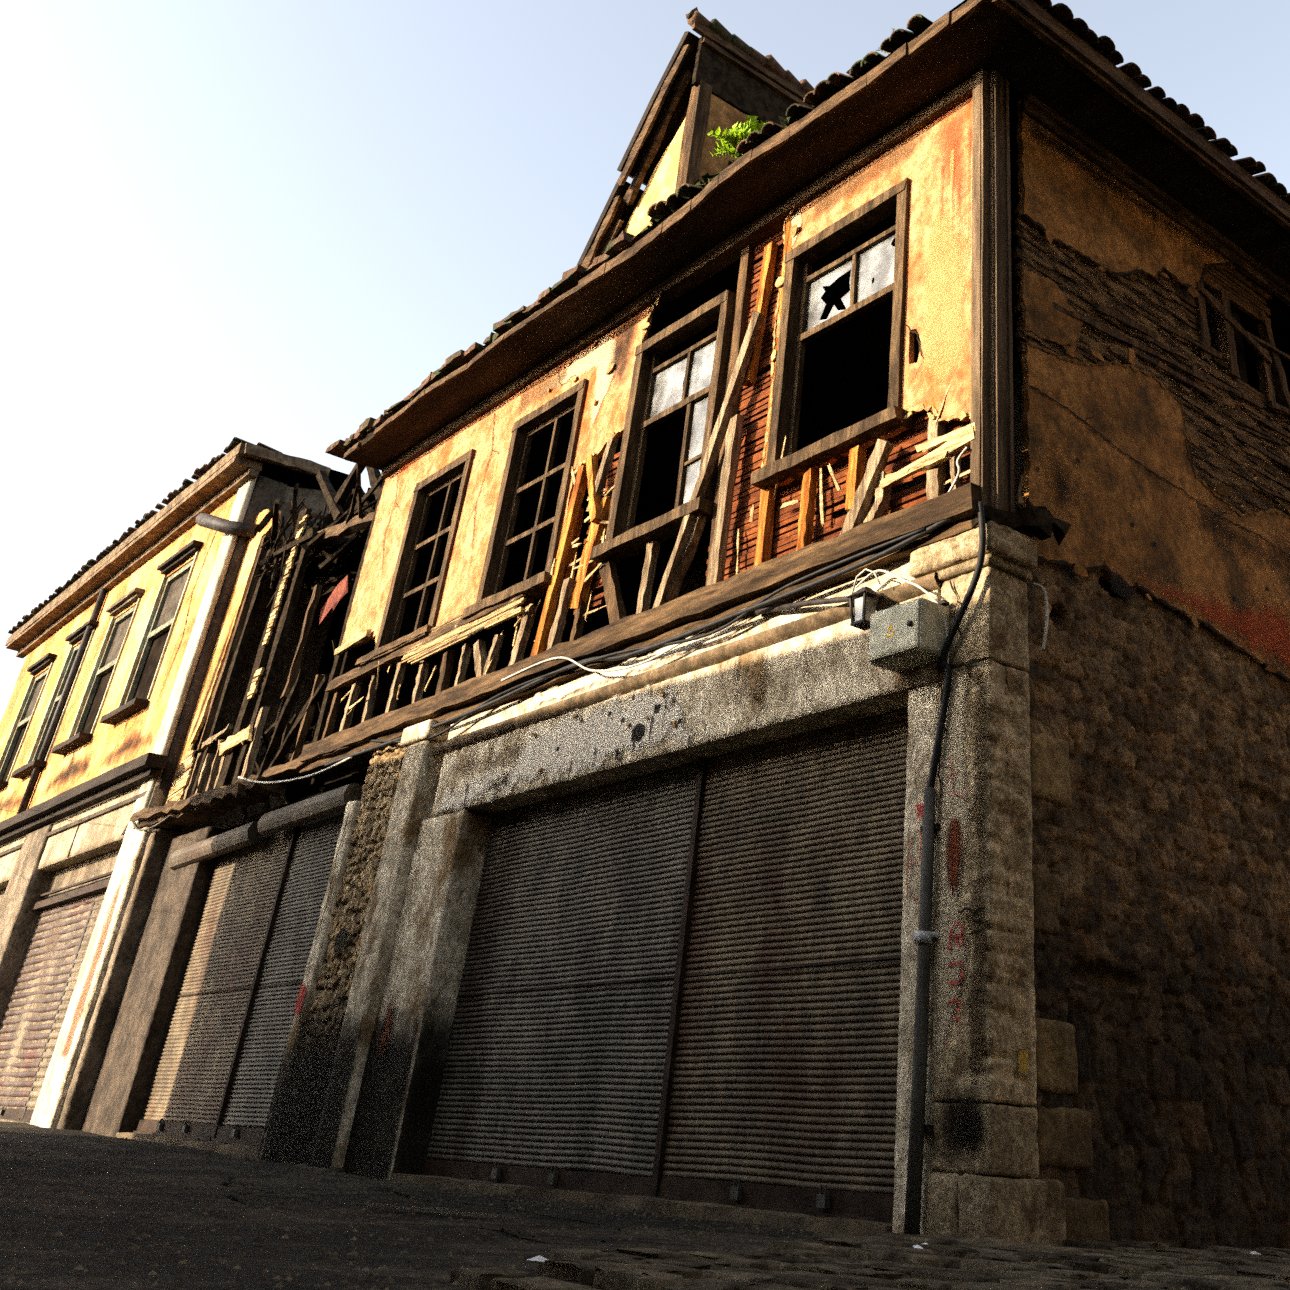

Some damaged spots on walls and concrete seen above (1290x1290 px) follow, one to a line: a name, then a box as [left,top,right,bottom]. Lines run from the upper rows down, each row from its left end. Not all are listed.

flaking render [1025,213,1233,298]
spalling [325,225,652,459]
flaking render [574,427,624,474]
flaking render [903,403,971,422]
flaking render [1037,556,1290,680]